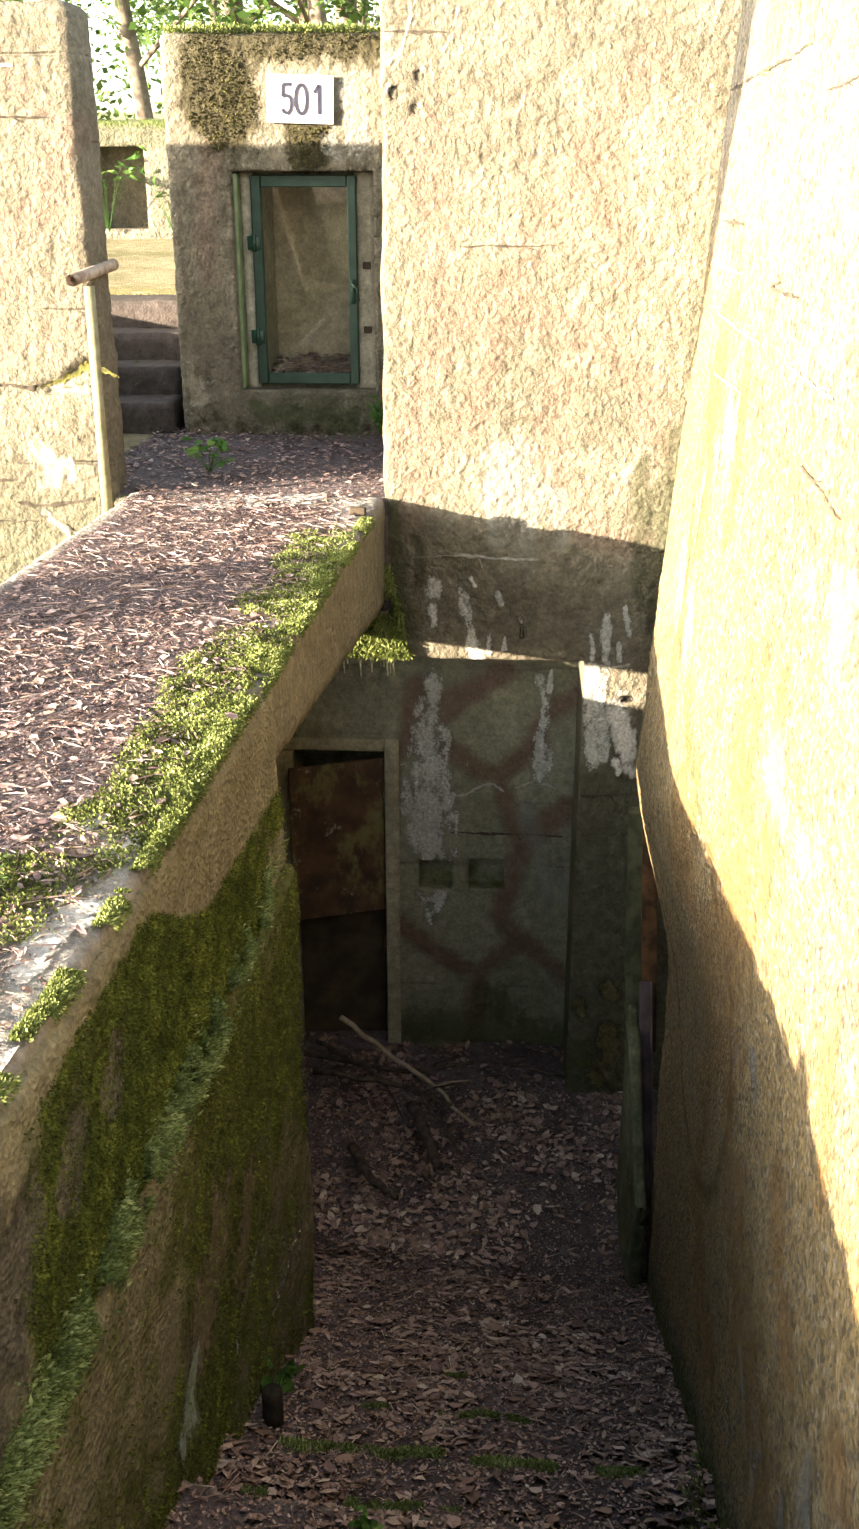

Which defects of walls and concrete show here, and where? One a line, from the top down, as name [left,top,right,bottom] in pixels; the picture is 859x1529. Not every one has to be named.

damp [424,576,507,659]
damp [400,667,461,861]
damp [532,669,554,783]
damp [583,605,632,771]
damp [415,890,447,926]